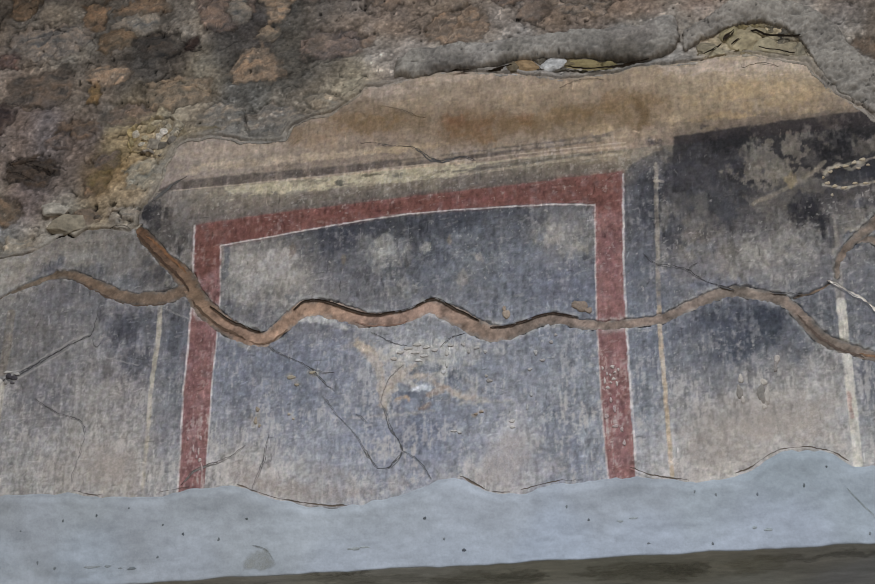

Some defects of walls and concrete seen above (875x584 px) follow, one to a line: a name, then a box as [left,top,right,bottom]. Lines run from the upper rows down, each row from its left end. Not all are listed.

spalling [696,24,808,58]
crack [152,176,187,202]
crack [0,214,875,480]
crack [36,399,100,496]
crack [237,437,347,507]
crack [460,476,572,493]